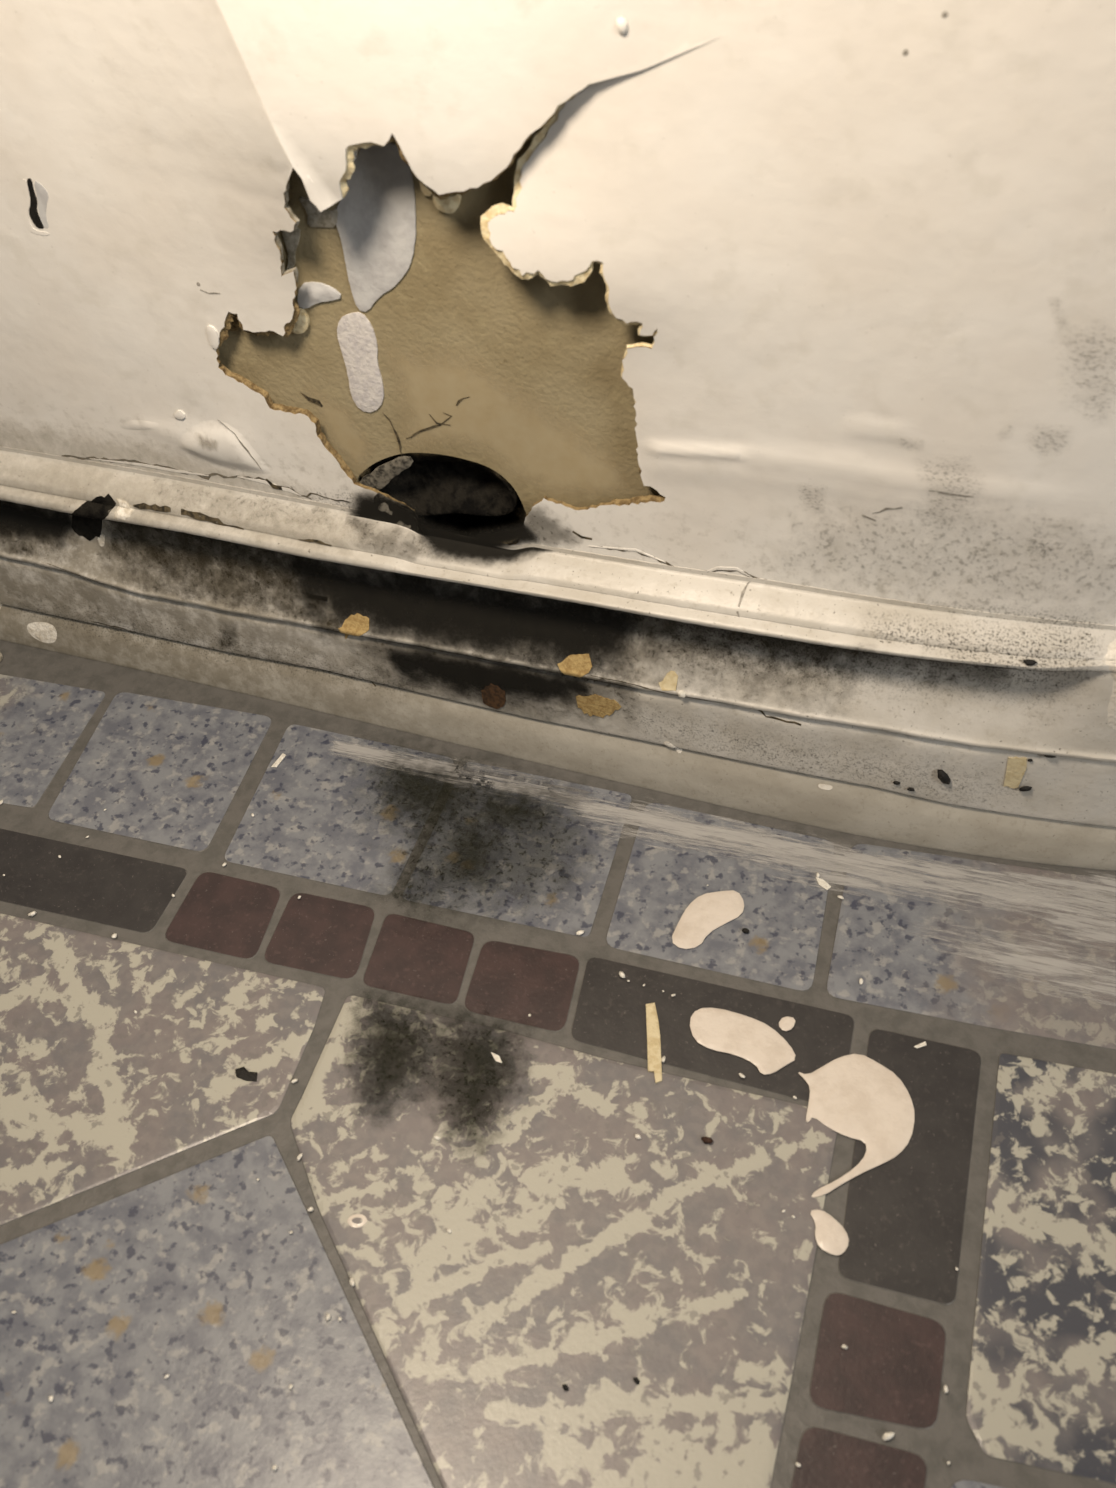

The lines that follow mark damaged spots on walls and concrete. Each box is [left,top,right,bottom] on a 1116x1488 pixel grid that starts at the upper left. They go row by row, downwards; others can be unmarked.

peeling [22,178,49,236]
spalling [207,0,723,532]
water stain [0,500,74,552]
water stain [322,494,573,562]
water stain [112,522,1091,711]
water stain [331,742,1116,1006]
water stain [359,1001,512,1136]